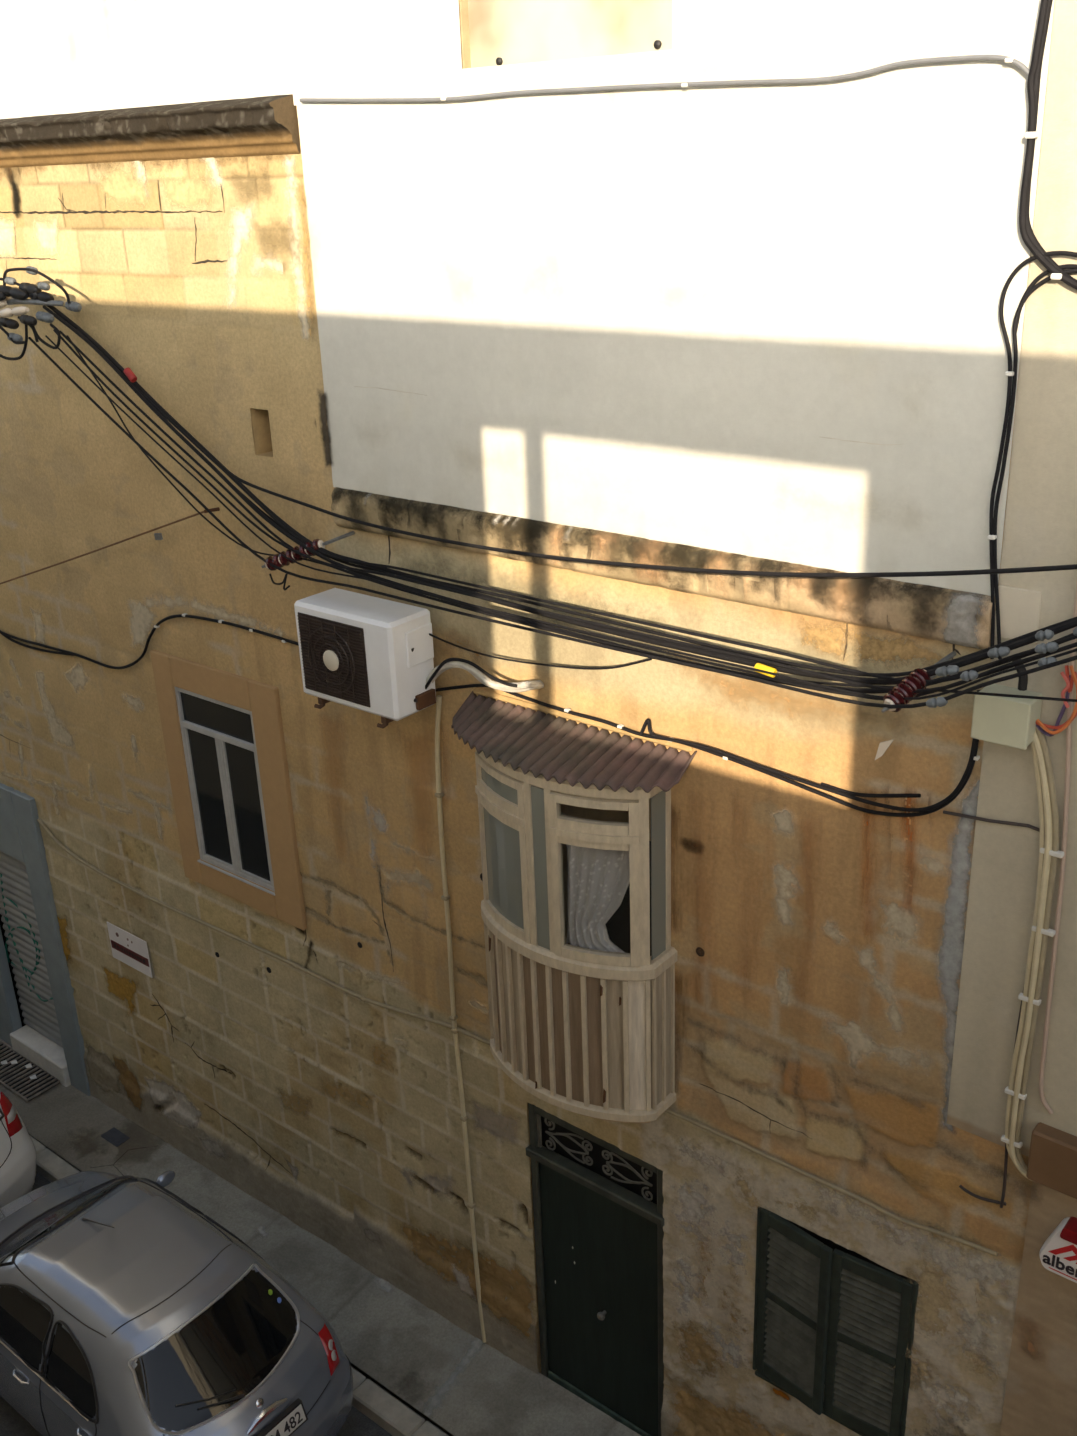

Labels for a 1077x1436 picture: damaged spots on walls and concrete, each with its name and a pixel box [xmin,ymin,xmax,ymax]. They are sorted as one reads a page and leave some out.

leakage [331,487,985,630]
crack [374,873,394,972]
crack [699,1083,808,1137]